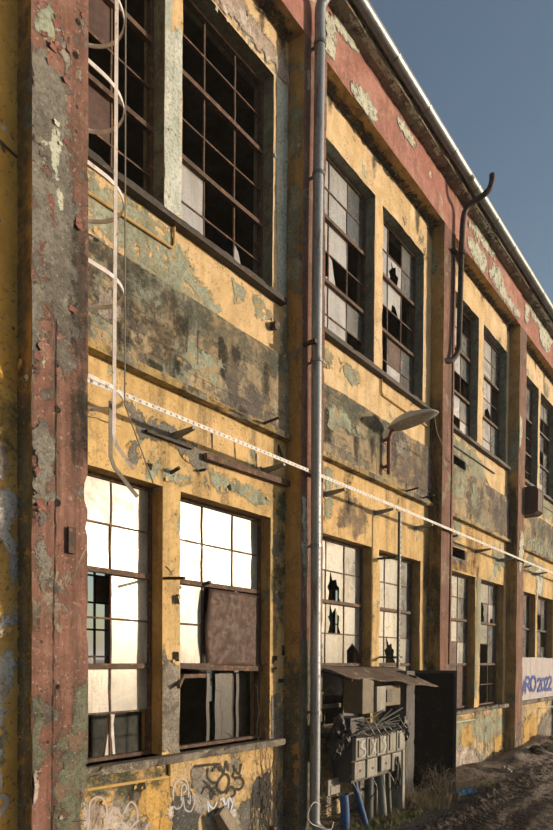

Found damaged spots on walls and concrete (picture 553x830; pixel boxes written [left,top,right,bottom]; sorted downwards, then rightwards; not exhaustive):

spalling [325,11,441,153]
peeling [0,3,100,830]
spalling [92,282,123,324]
leakage [71,229,282,462]
peeling [126,401,273,509]
leakage [324,389,442,670]
leakage [467,476,518,560]
peeling [459,181,553,353]
spalling [82,794,151,830]
spalling [191,767,221,830]